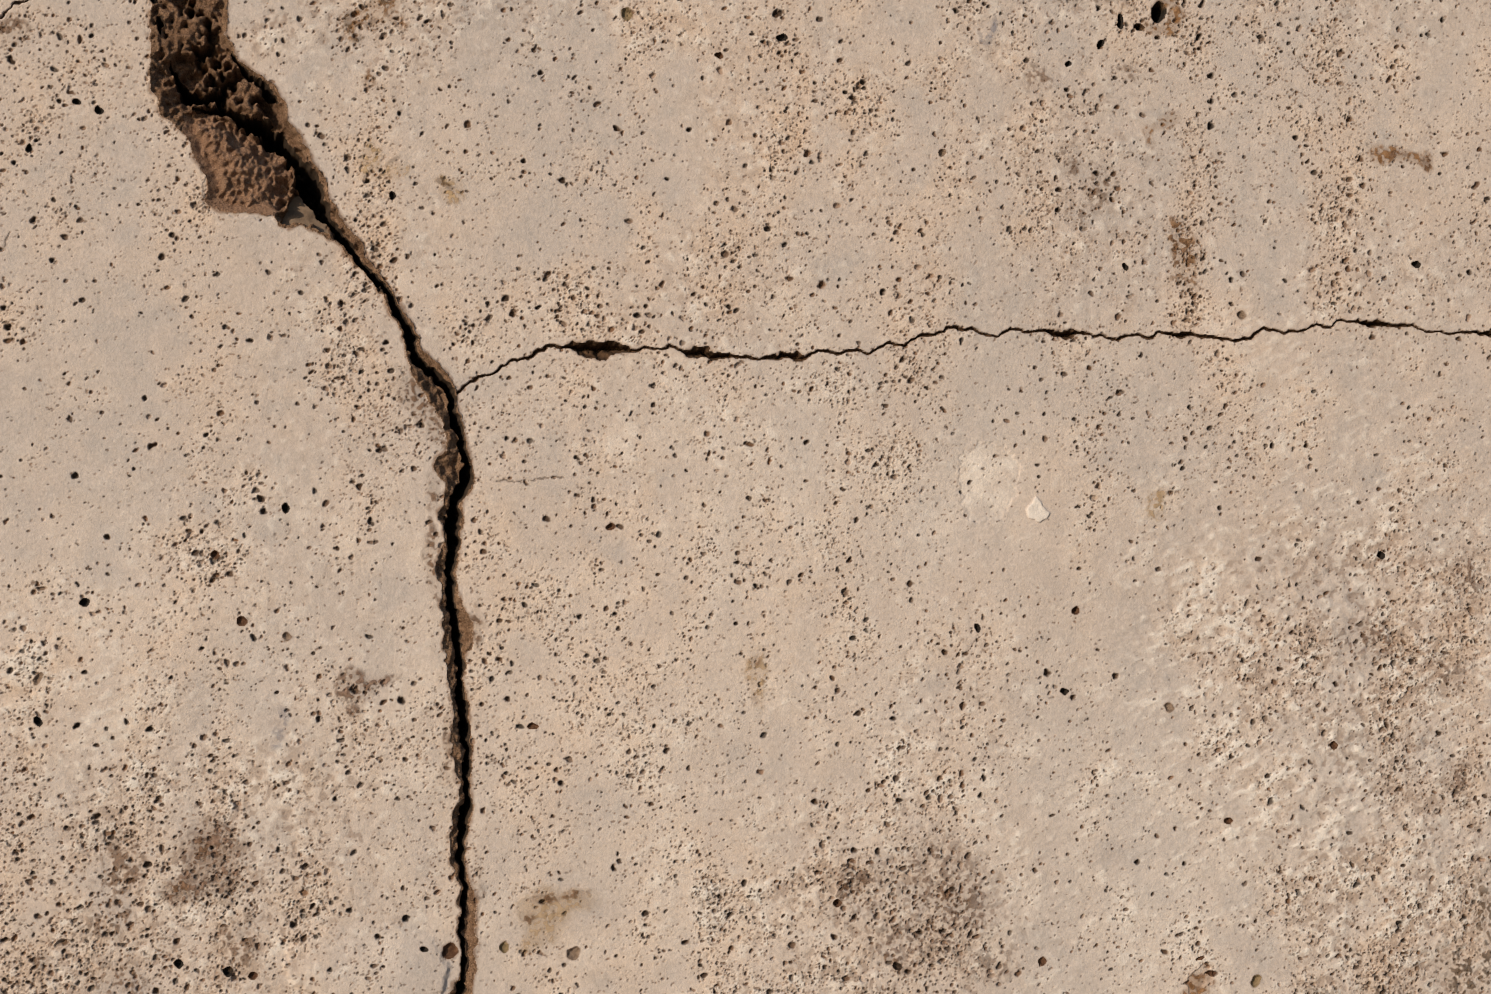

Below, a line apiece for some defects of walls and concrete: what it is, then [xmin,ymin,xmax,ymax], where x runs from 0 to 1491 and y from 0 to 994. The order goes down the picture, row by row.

crack [0,0,29,19]
crack [456,318,1491,395]
crack [148,0,478,994]
crack [496,475,564,483]